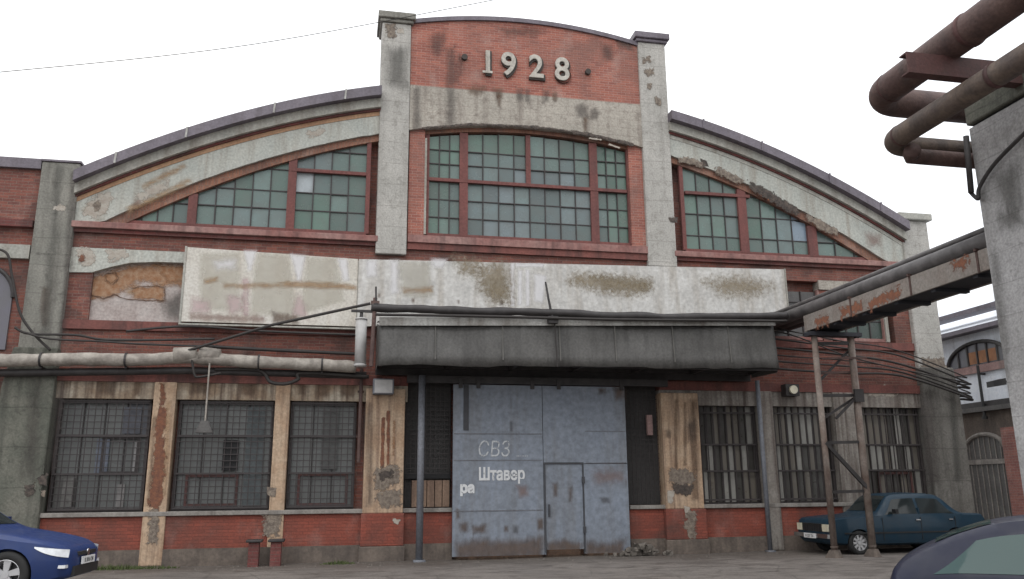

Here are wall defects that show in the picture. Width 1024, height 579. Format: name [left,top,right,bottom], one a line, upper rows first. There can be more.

spalling [642,55,661,106]
spalling [678,157,840,236]
flaking render [77,246,183,302]
rust [814,284,901,329]
flaking render [146,383,168,544]
flaking render [372,411,403,525]
flaking render [667,468,698,539]